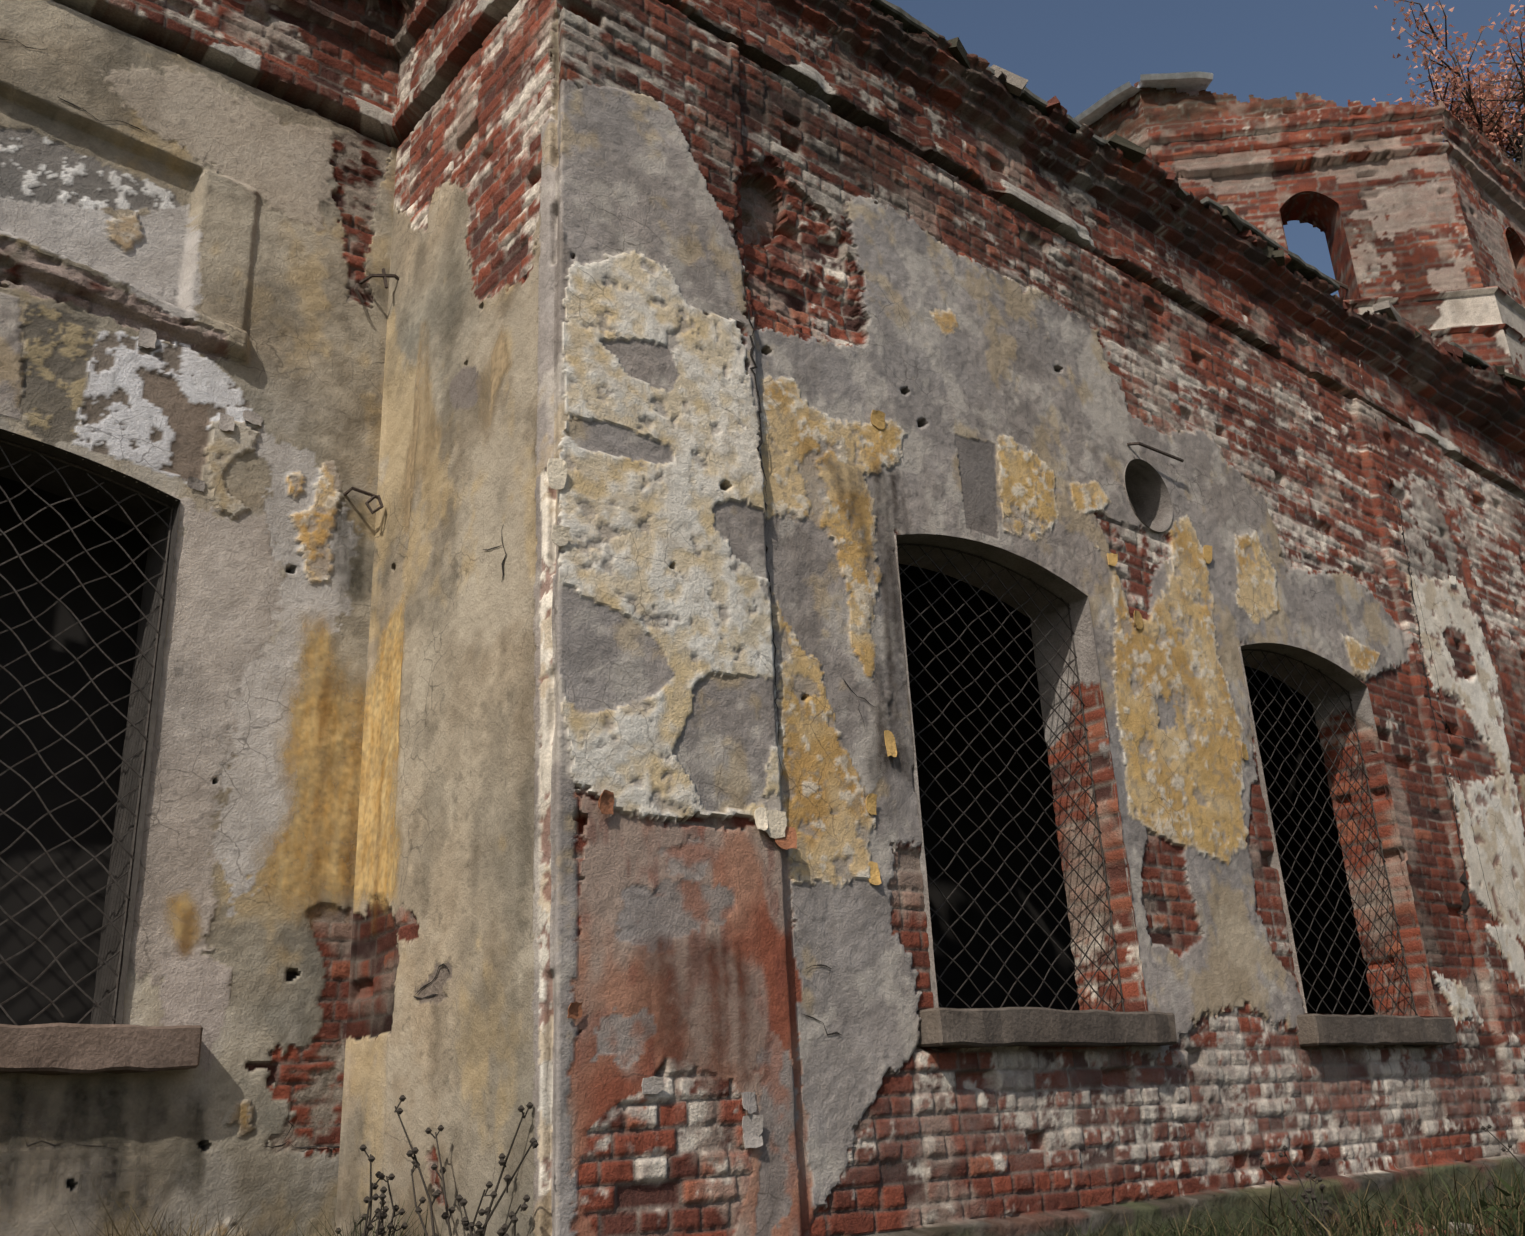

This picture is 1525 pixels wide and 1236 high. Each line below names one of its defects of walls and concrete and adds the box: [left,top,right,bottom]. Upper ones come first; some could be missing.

peeling [0,126,183,252]
peeling [0,236,365,916]
spalling [330,0,1525,1236]
spalling [227,895,419,1157]
damp [658,940,683,1064]
damp [706,941,748,1052]